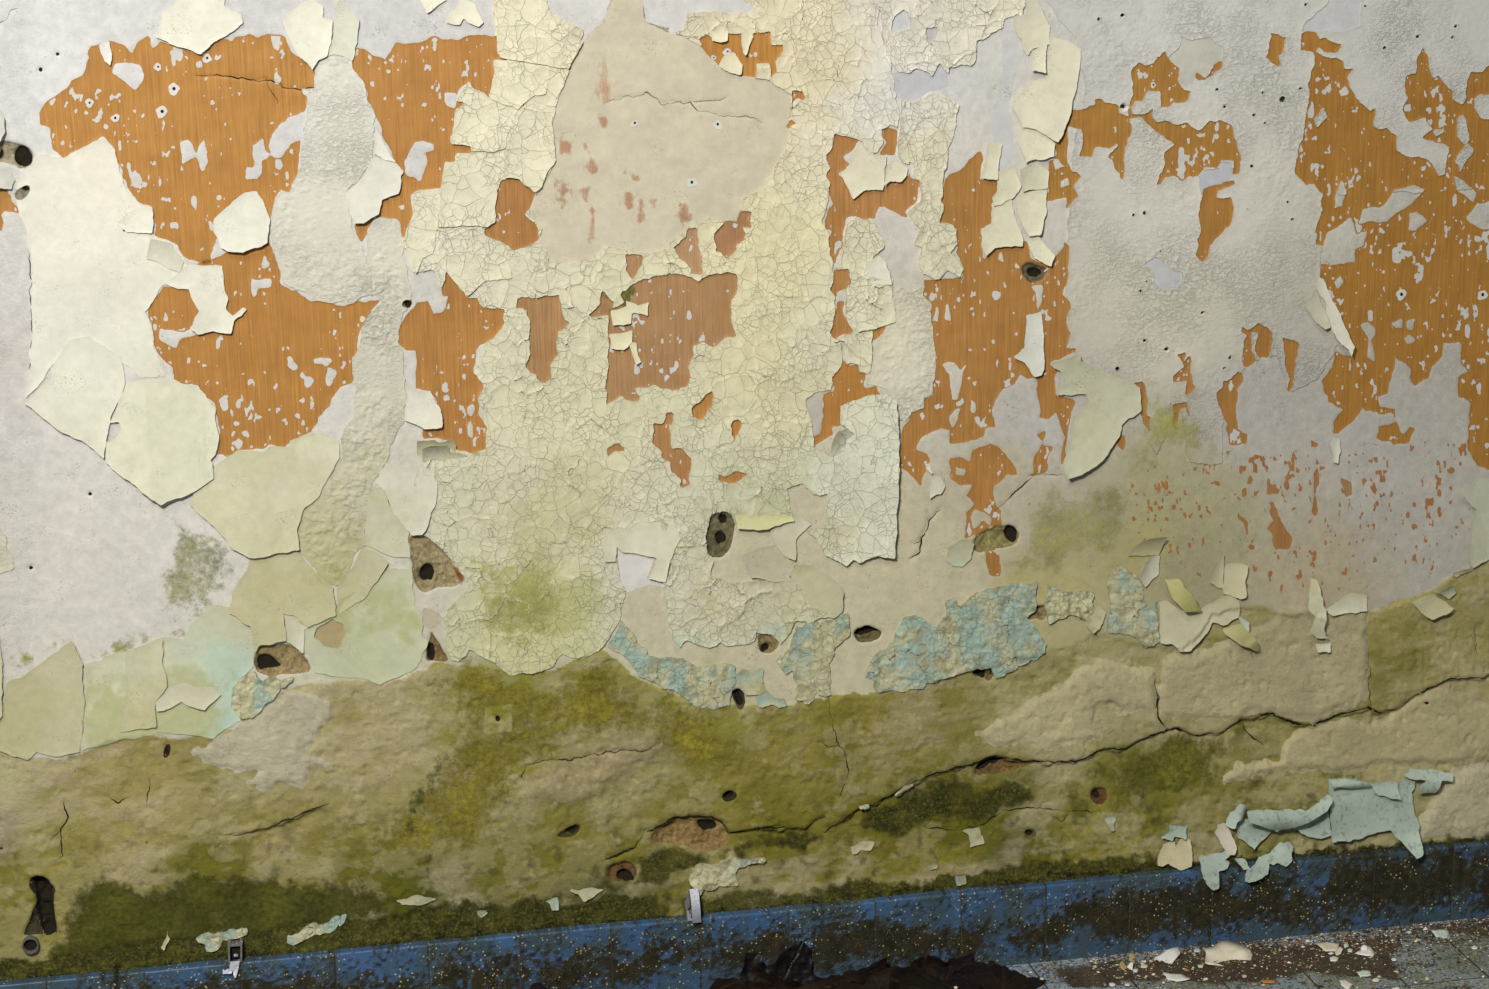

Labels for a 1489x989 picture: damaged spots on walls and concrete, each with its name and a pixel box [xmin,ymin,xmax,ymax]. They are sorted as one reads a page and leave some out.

peeling [0,0,1253,760]
crack [607,91,759,121]
peeling [1128,31,1489,653]
crack [605,631,1487,860]